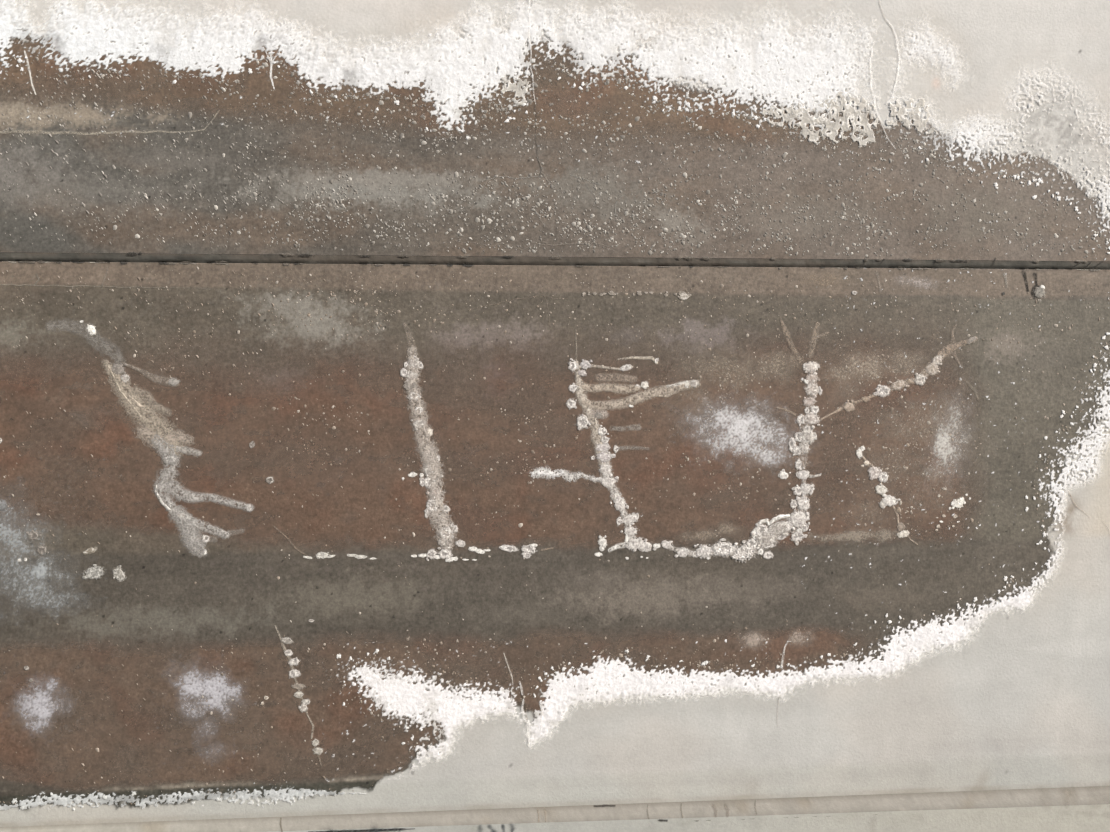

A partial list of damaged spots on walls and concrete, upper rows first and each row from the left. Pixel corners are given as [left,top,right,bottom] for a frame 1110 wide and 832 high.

rust [0,36,862,141]
peeling [501,74,530,106]
water stain [0,0,1110,261]
peeling [762,92,937,146]
rust [0,343,974,549]
water stain [0,261,1110,810]
rust [0,628,861,790]